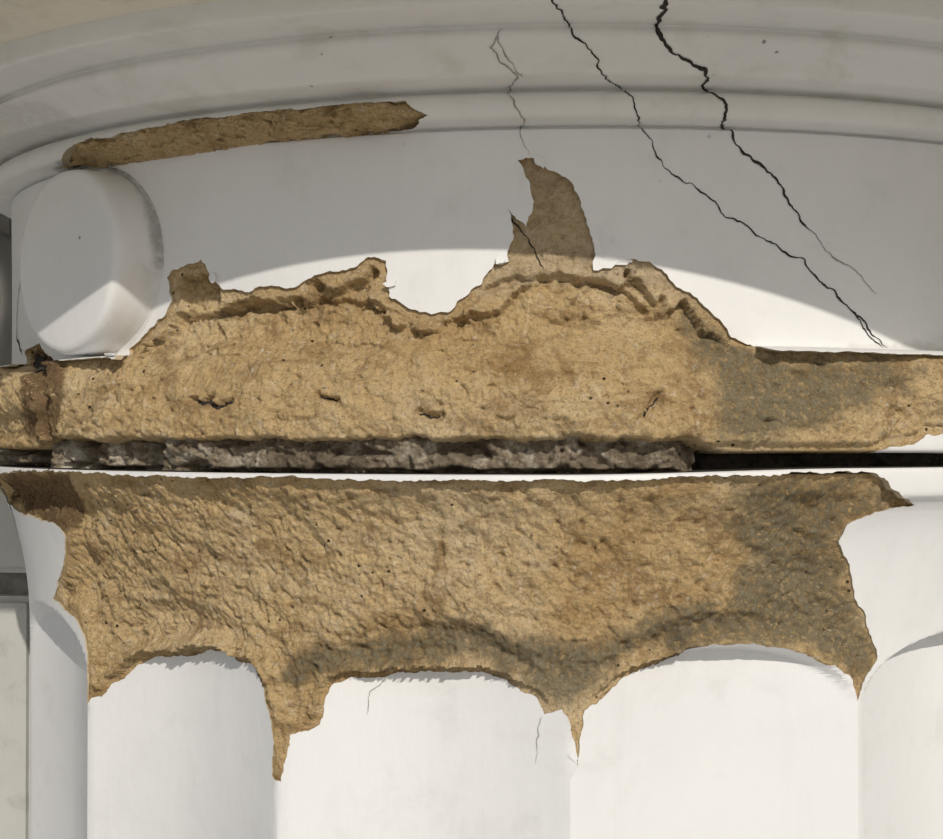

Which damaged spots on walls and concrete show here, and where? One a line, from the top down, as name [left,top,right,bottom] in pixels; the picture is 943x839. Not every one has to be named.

spalling [60,101,427,170]
crack [489,28,529,151]
crack [551,0,888,348]
crack [16,286,50,374]
spalling [0,155,943,454]
crack [0,436,943,526]
spalling [0,469,914,782]